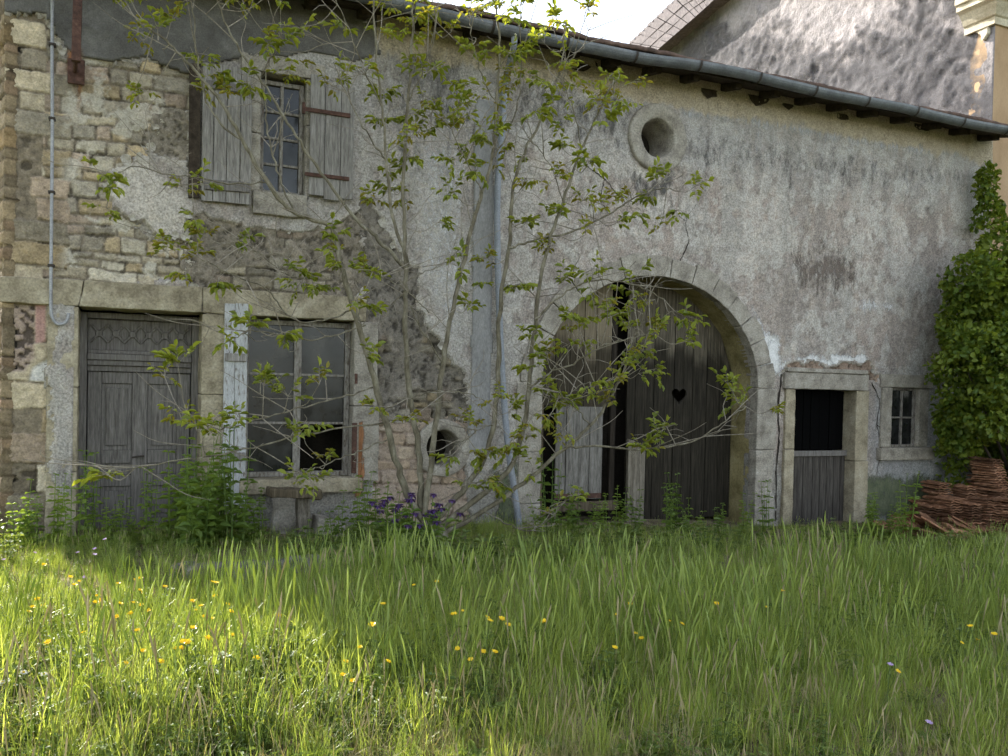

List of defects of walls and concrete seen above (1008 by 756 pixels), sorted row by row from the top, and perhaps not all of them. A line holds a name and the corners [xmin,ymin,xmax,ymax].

flaking render [0,13,470,538]
water stain [683,0,993,120]